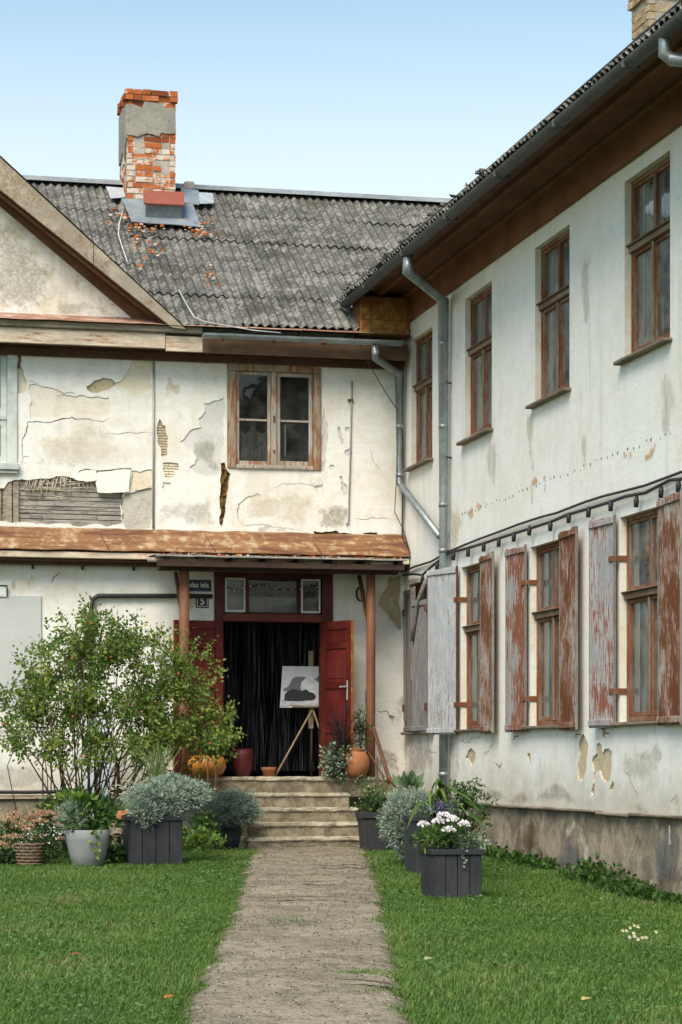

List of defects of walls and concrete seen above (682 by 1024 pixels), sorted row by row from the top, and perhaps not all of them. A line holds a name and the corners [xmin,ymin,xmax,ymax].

peeling [87,360,152,396]
crack [22,392,150,462]
flaking render [0,397,261,529]
flaking render [378,576,401,629]
flaking render [465,748,476,766]
flaking render [577,728,614,795]
leakage [558,824,588,865]